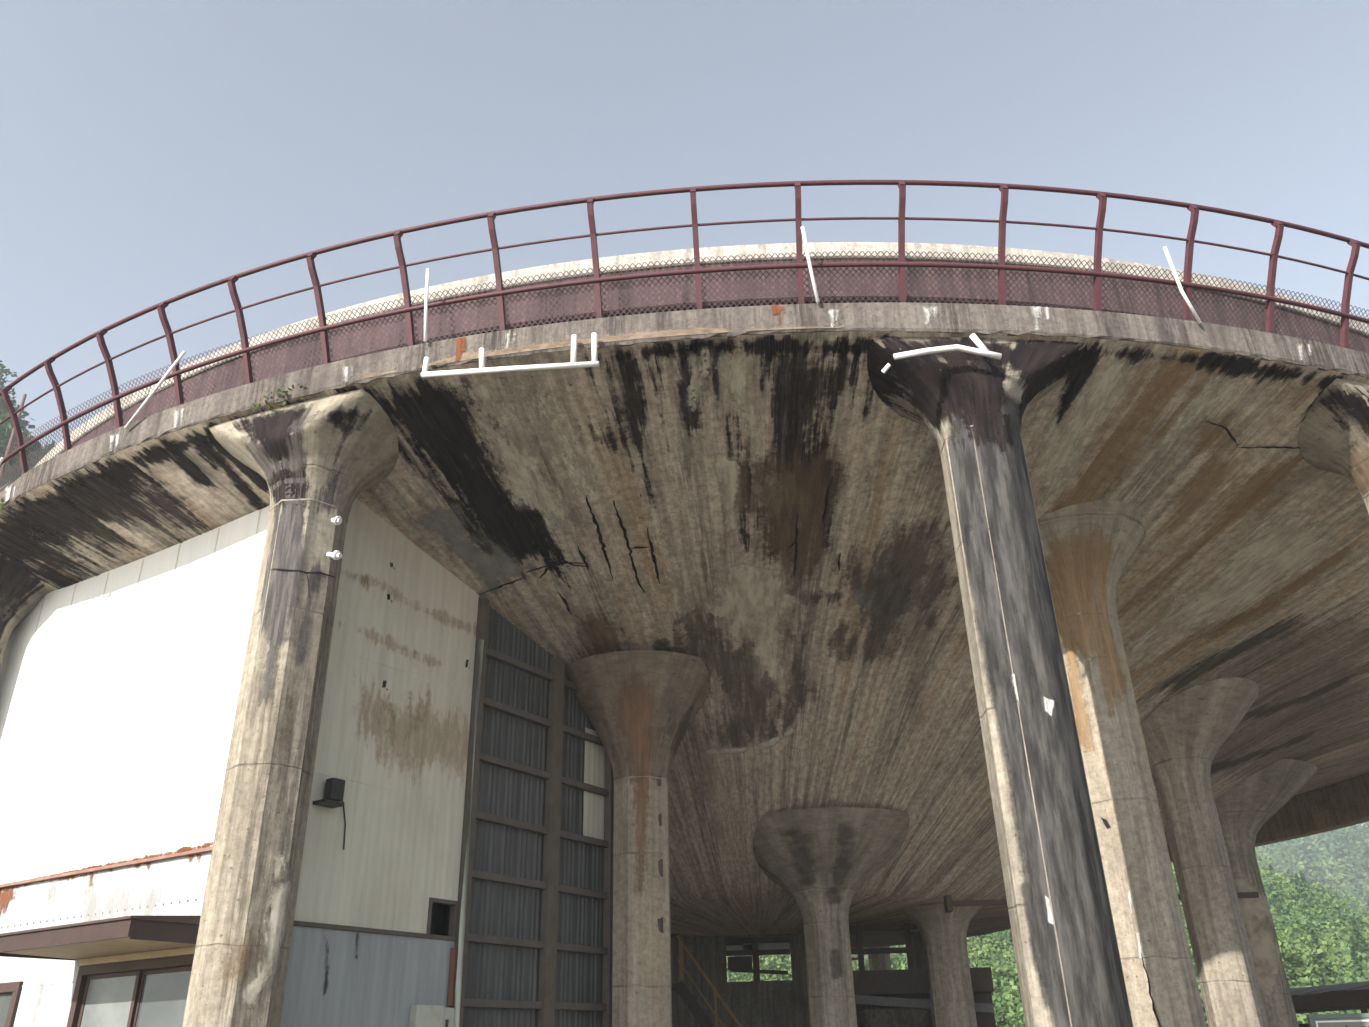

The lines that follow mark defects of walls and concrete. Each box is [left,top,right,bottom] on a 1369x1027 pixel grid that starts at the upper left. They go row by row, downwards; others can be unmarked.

damp [0,309,1019,703]
crack [480,497,660,615]
damp [1025,342,1369,750]
damp [1210,728,1321,774]
rust [0,841,213,915]
damp [224,941,265,977]
crack [1141,955,1161,1027]